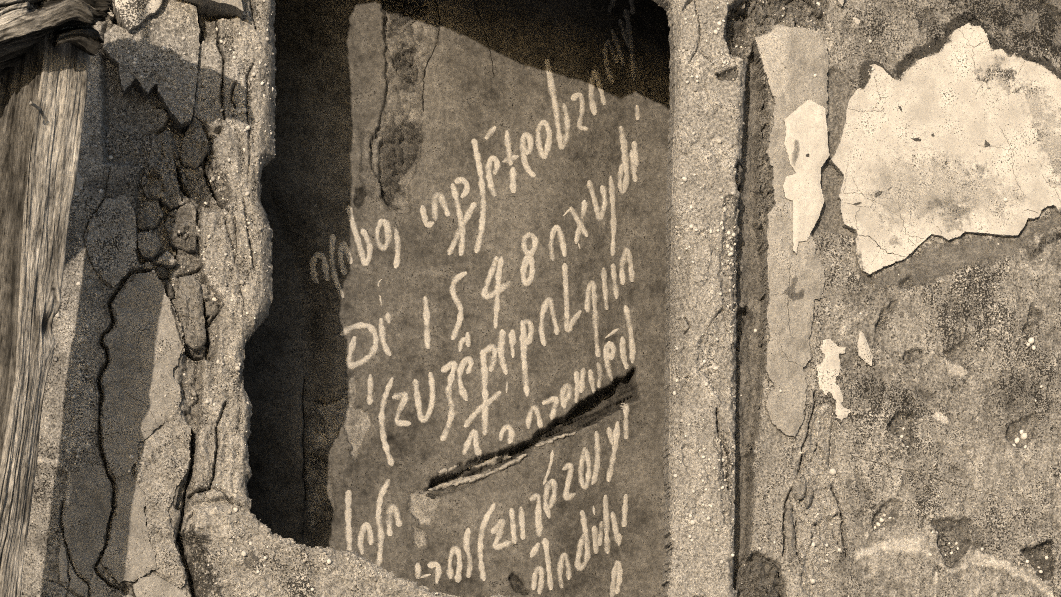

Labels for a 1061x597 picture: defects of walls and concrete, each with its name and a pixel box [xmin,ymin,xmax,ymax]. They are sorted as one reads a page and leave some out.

peeling [102,0,244,132]
crack [200,21,253,174]
spalling [917,9,935,30]
peeling [715,16,1061,437]
crack [47,161,254,597]
crack [783,392,835,559]
crack [831,490,846,553]
spalling [888,407,915,448]
spalling [1006,415,1038,449]